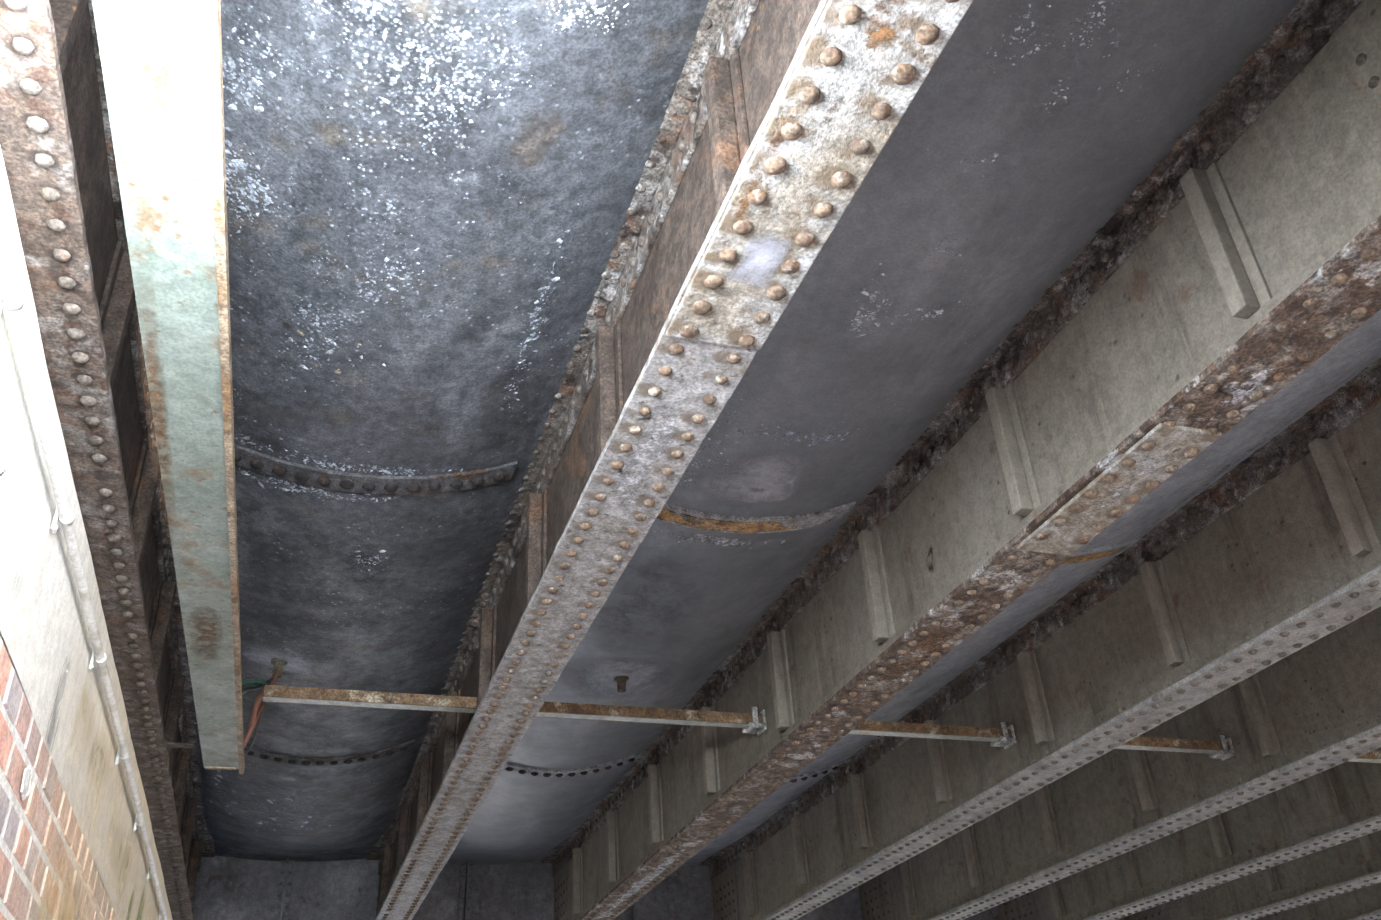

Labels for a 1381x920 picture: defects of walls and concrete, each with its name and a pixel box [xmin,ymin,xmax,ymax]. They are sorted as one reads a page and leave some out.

rust [769,116,793,151]
rust [736,170,764,218]
rust [147,342,169,484]
rust [657,508,796,533]
rust [1063,547,1125,564]
water stain [49,674,66,739]